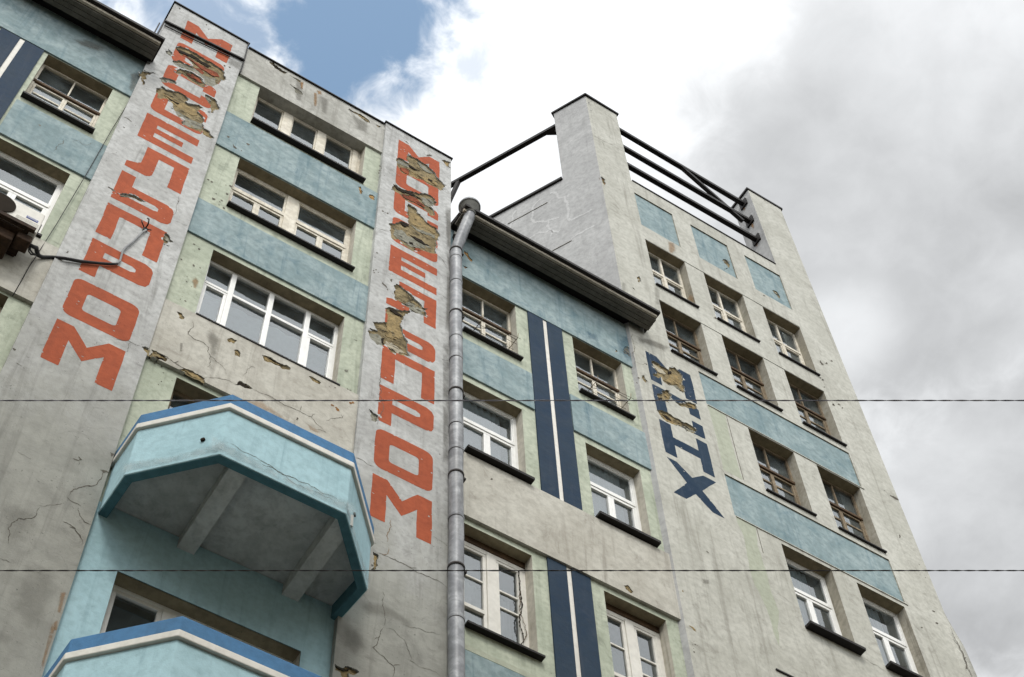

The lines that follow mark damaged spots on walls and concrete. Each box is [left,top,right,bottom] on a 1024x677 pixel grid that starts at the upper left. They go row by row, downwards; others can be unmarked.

flaking render [138,46,231,138]
flaking render [379,141,449,254]
flaking render [368,252,427,356]
flaking render [143,348,168,385]
flaking render [181,369,204,383]
crack [170,325,343,432]
flaking render [636,360,696,433]
crack [2,462,103,562]
crack [233,444,340,503]
crack [374,593,440,673]